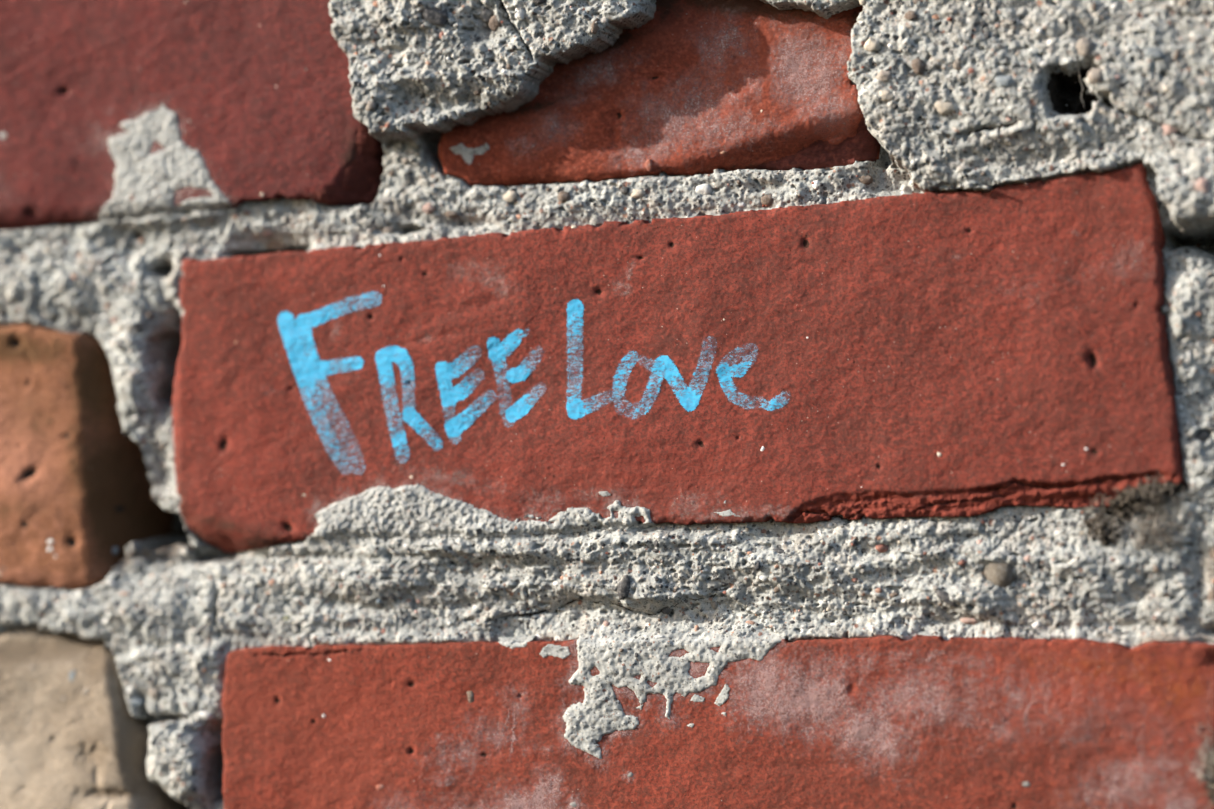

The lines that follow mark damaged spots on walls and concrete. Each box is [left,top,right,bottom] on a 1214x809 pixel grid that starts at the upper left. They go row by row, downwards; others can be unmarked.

crack [500,0,533,59]
spalling [756,115,879,170]
spalling [793,475,1182,523]
damp [546,642,642,766]
damp [670,640,1052,782]